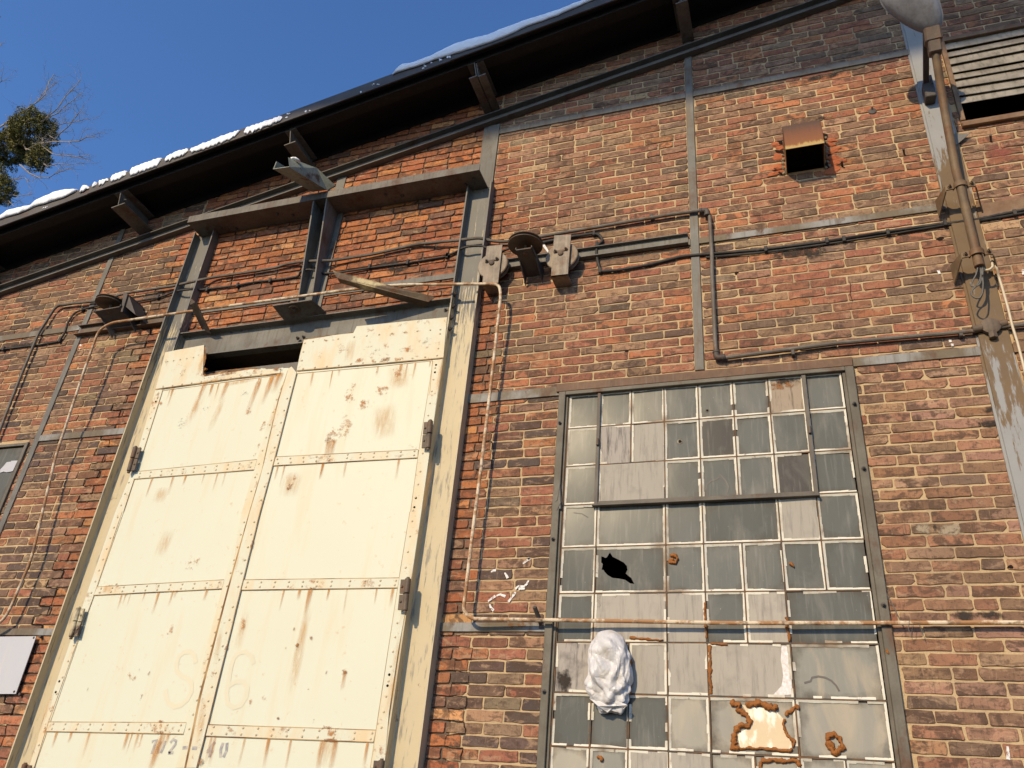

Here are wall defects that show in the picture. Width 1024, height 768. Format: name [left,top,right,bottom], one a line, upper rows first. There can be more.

peeling [767,142,784,177]
peeling [824,138,848,175]